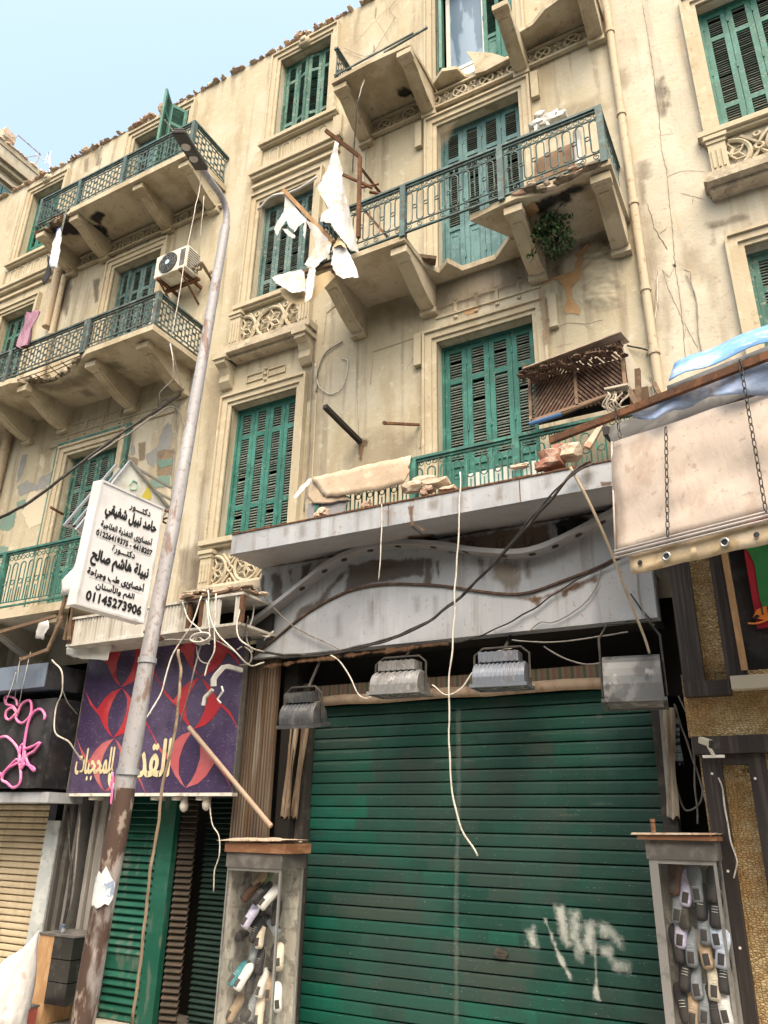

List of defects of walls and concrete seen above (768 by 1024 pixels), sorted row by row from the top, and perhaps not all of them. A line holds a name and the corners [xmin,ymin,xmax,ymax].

spalling [433,51,510,91]
spalling [511,161,601,217]
damp [535,185,585,213]
crack [642,5,706,352]
peeling [539,243,589,344]
peeling [128,423,174,487]
peeling [0,454,52,531]